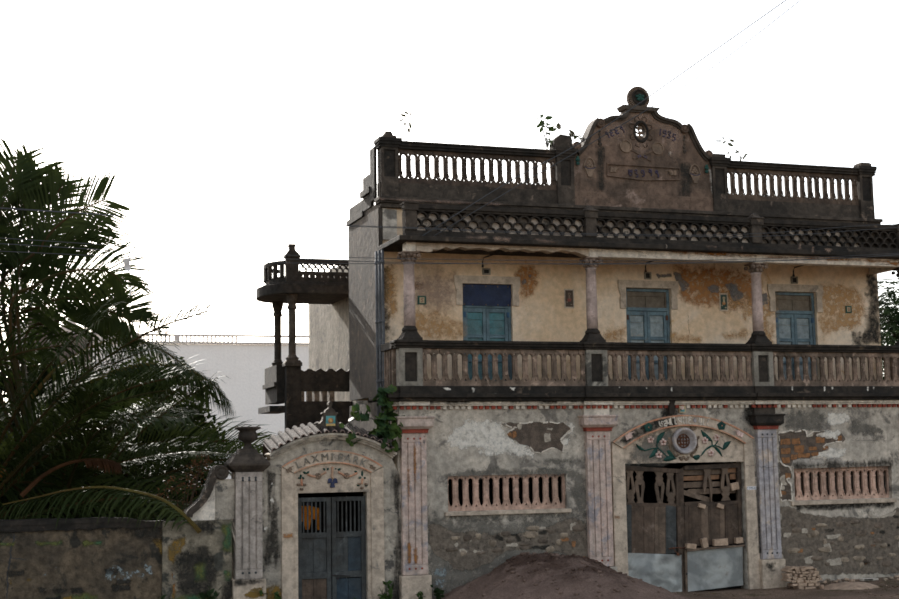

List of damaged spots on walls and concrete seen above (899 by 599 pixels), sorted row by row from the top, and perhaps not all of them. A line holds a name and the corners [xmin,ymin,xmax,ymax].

peeling [515,266,538,297]
leakage [852,274,884,345]
peeling [447,419,575,458]
spalling [778,413,899,575]
leakage [197,521,215,534]
spalling [428,518,588,572]
leakage [172,546,260,599]